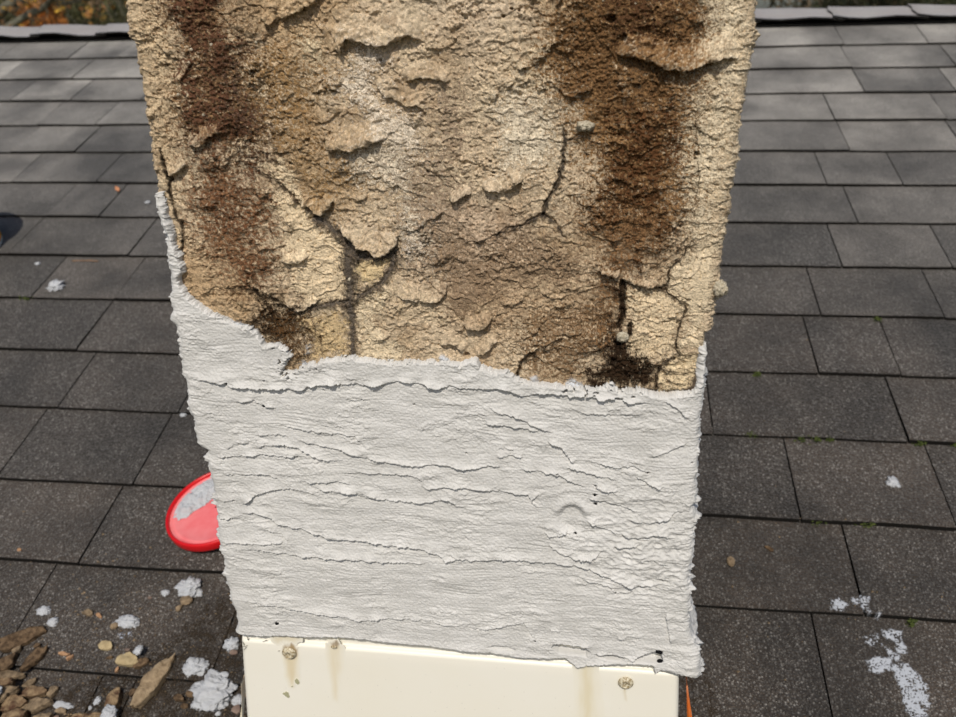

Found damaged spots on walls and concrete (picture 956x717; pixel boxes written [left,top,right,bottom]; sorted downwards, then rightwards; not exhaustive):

peeling [261,0,316,25]
peeling [320,1,429,54]
peeling [614,27,741,72]
peeling [376,58,451,109]
peeling [325,117,386,153]
crack [159,150,184,251]
damp [150,0,756,388]
crack [475,128,584,244]
crack [224,172,399,355]
crack [564,239,696,391]
corrosion [269,636,303,689]
corrosion [324,638,345,704]